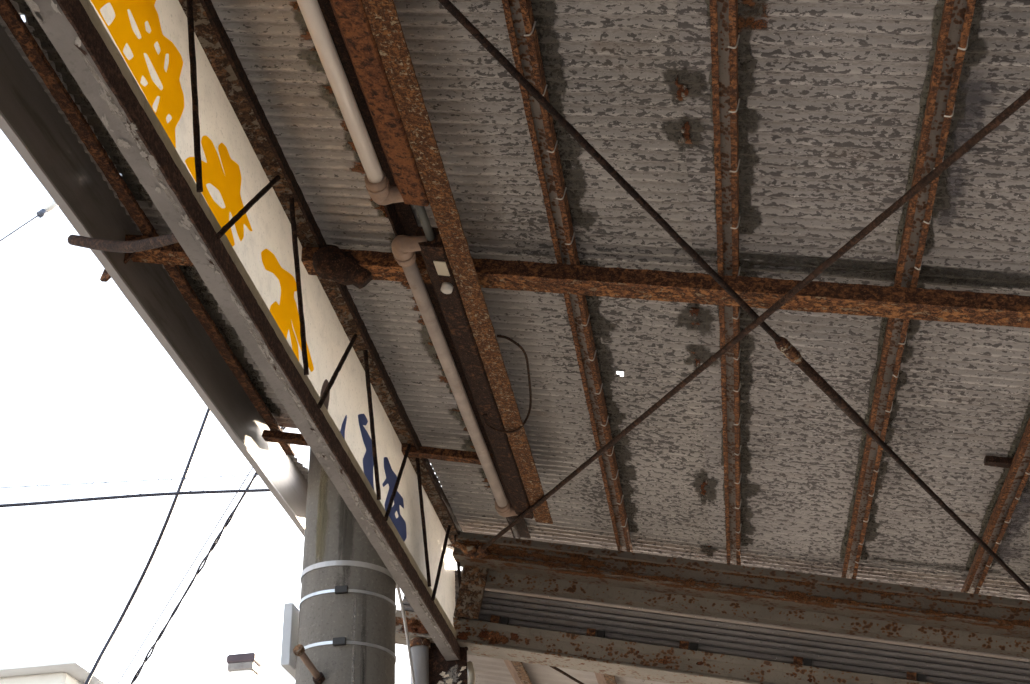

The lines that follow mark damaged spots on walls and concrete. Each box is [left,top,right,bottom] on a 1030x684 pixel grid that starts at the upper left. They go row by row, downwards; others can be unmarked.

rust [324,73,366,174]
rust [402,282,425,325]
rust [448,540,1030,630]
rust [457,627,529,655]